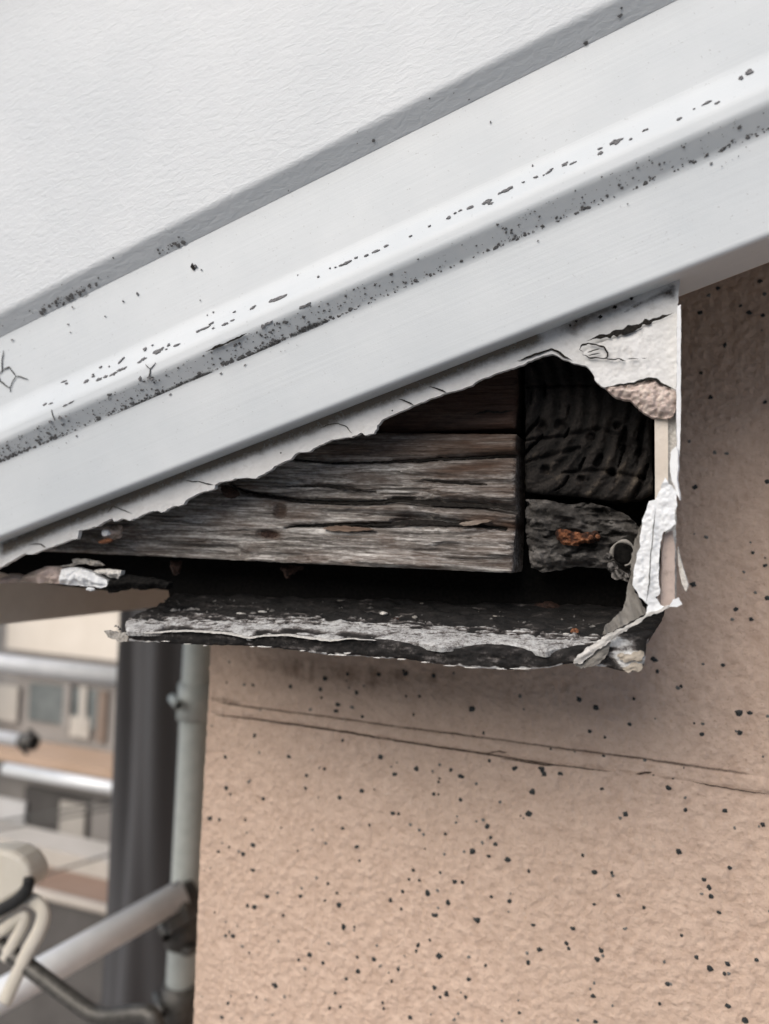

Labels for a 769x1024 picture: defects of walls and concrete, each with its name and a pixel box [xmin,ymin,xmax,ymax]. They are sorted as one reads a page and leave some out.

damp [0,119,769,463]
crack [0,350,27,392]
peeling [83,343,181,383]
damp [2,334,539,554]
spalling [605,380,676,420]
corrosion [555,529,600,546]
peeling [573,447,689,664]
crack [220,704,766,794]